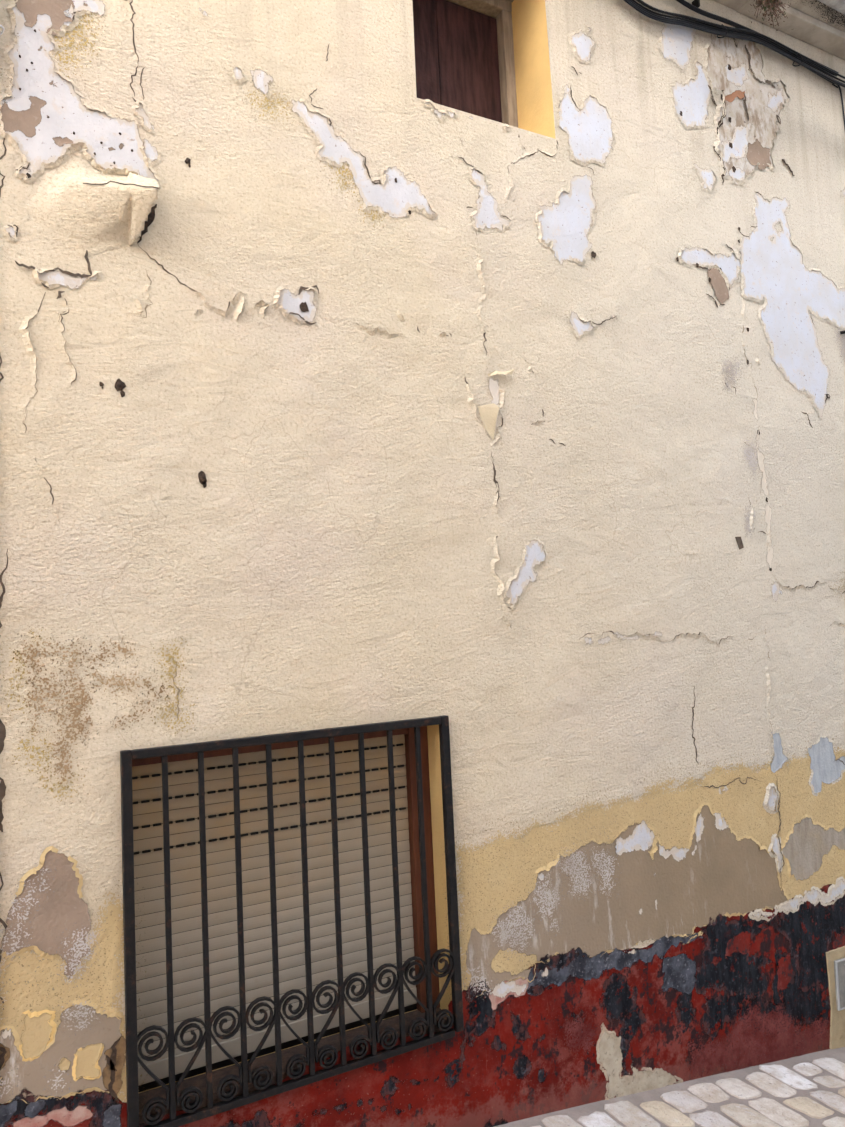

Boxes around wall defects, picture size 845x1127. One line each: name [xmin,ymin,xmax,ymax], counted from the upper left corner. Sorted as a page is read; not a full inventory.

crack [0,138,8,197]
peeling [0,0,162,187]
crack [126,0,145,102]
peeling [535,25,616,266]
spalling [659,13,795,192]
crack [184,286,270,322]
peeling [676,192,845,419]
crack [0,549,8,636]
crack [0,719,8,832]
crack [0,918,8,962]
peeling [294,731,845,1127]
peeling [0,999,126,1127]